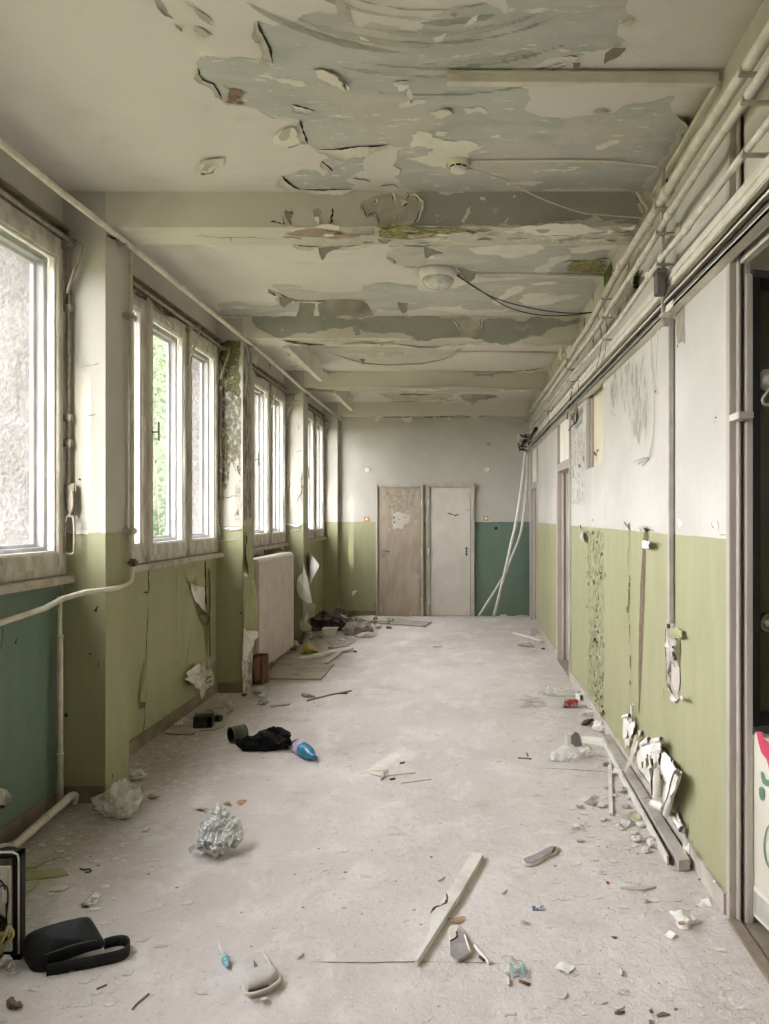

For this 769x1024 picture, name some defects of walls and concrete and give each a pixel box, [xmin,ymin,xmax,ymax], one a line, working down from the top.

peeling [154,0,680,387]
mould [564,258,613,287]
mould [219,347,251,520]
peeling [374,392,498,422]
peeling [185,560,215,699]
peeling [218,470,303,692]
peeling [297,552,319,642]
flaking render [664,618,683,703]
peeling [621,703,689,855]